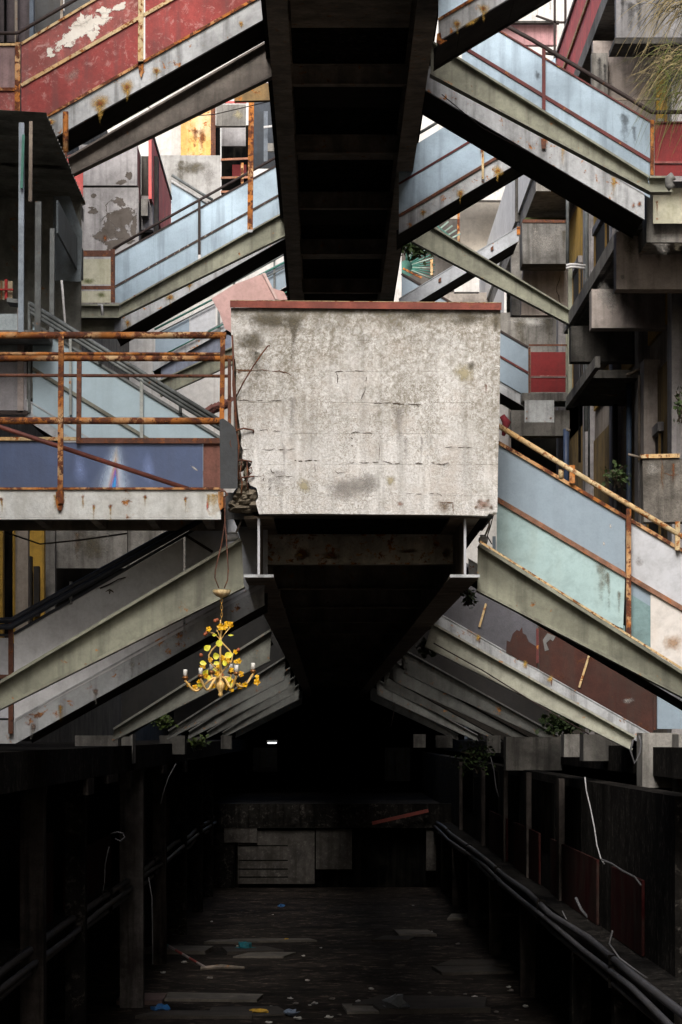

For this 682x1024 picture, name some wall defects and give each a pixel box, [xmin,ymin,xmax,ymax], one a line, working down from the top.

peeling [46,2,126,58]